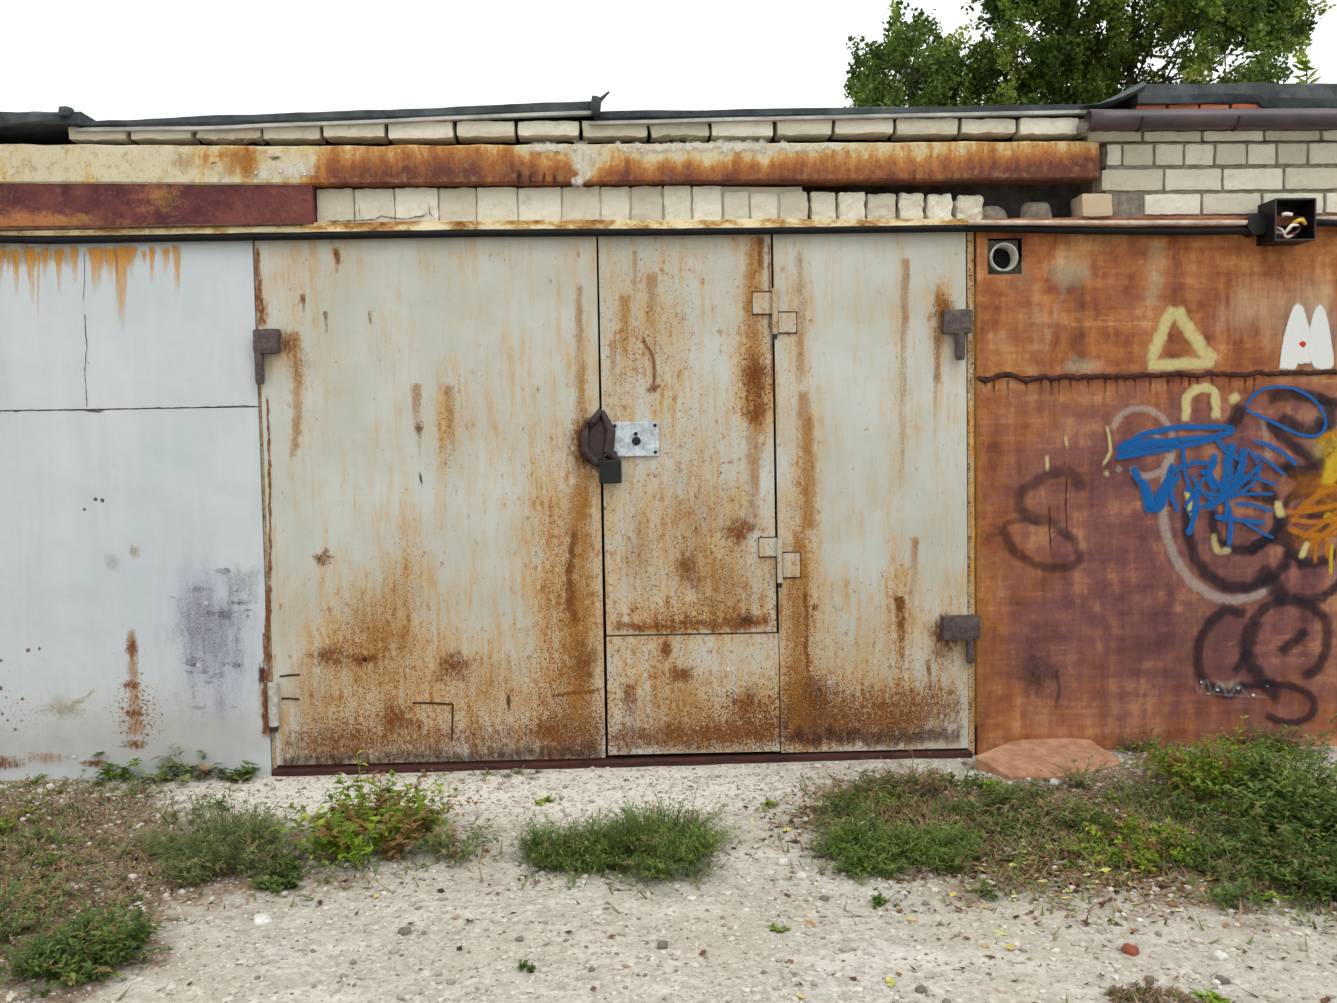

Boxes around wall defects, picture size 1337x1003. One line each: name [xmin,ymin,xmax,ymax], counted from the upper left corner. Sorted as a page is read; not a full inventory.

corrosion [0,246,181,305]
corrosion [281,332,302,448]
corrosion [642,337,660,392]
corrosion [721,235,773,545]
corrosion [932,287,955,378]
corrosion [970,288,1009,612]
corrosion [258,366,609,769]
corrosion [611,611,772,633]
corrosion [665,507,747,595]
corrosion [787,394,981,747]
corrosion [119,633,147,748]